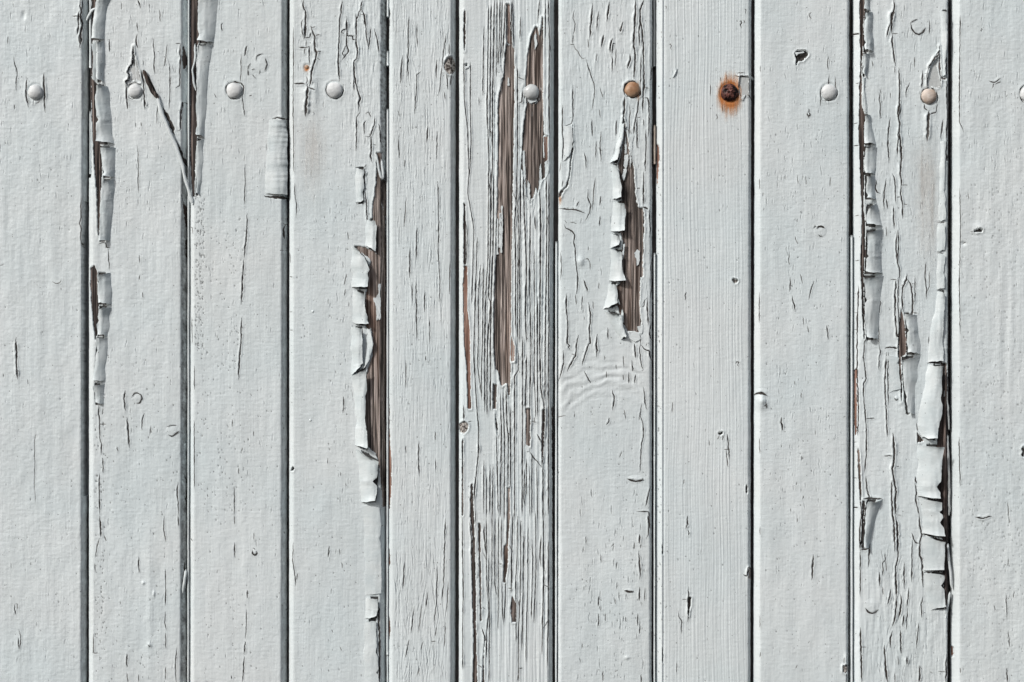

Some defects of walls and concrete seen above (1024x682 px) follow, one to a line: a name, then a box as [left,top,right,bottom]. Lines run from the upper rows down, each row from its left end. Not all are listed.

peeling [90,266,112,404]
peeling [91,0,116,241]
peeling [180,0,218,266]
peeling [351,153,392,682]
crack [238,0,690,682]
peeling [463,204,471,409]
peeling [492,4,548,430]
peeling [603,119,648,342]
corrosion [718,77,741,113]
peeling [858,0,884,339]
crack [820,1,982,682]
peeling [885,141,948,610]